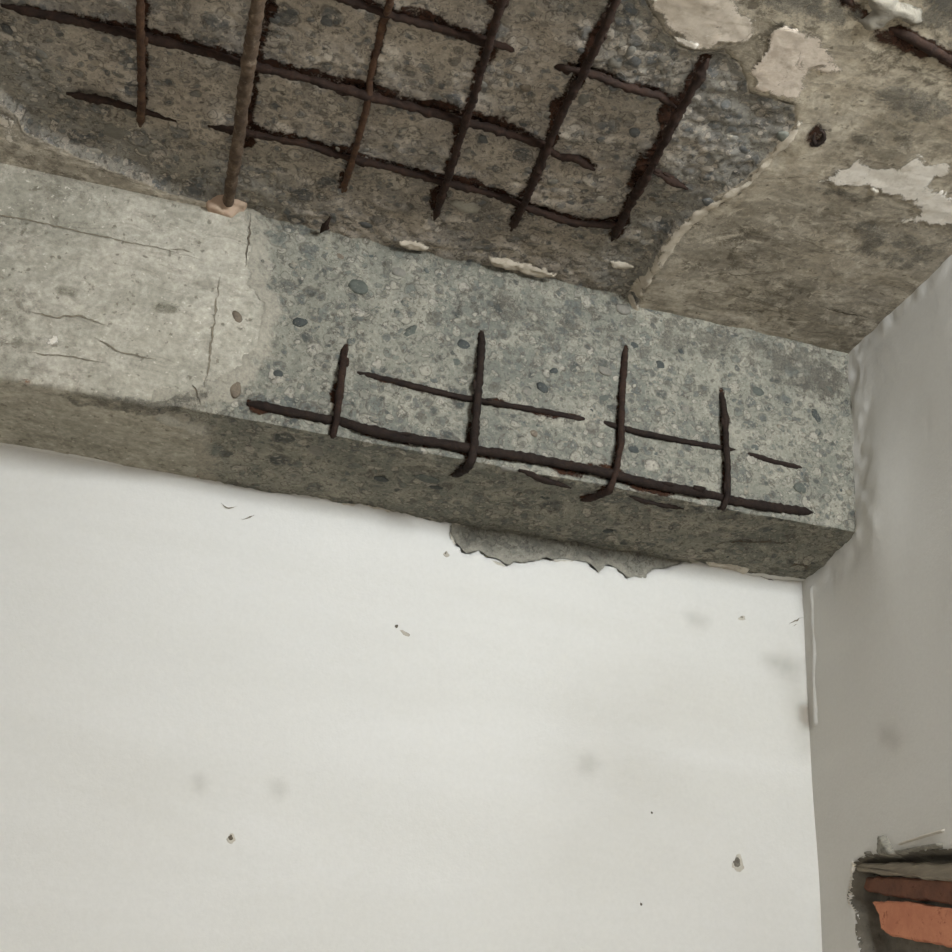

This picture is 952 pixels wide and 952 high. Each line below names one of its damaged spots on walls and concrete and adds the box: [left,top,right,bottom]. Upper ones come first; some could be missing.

corrosion [26,0,242,58]
corrosion [838,0,869,19]
corrosion [873,25,952,72]
corrosion [243,0,713,240]
corrosion [807,123,826,147]
spalling [0,0,856,581]
corrosion [362,377,674,501]
corrosion [717,416,730,509]
spalling [847,829,952,952]